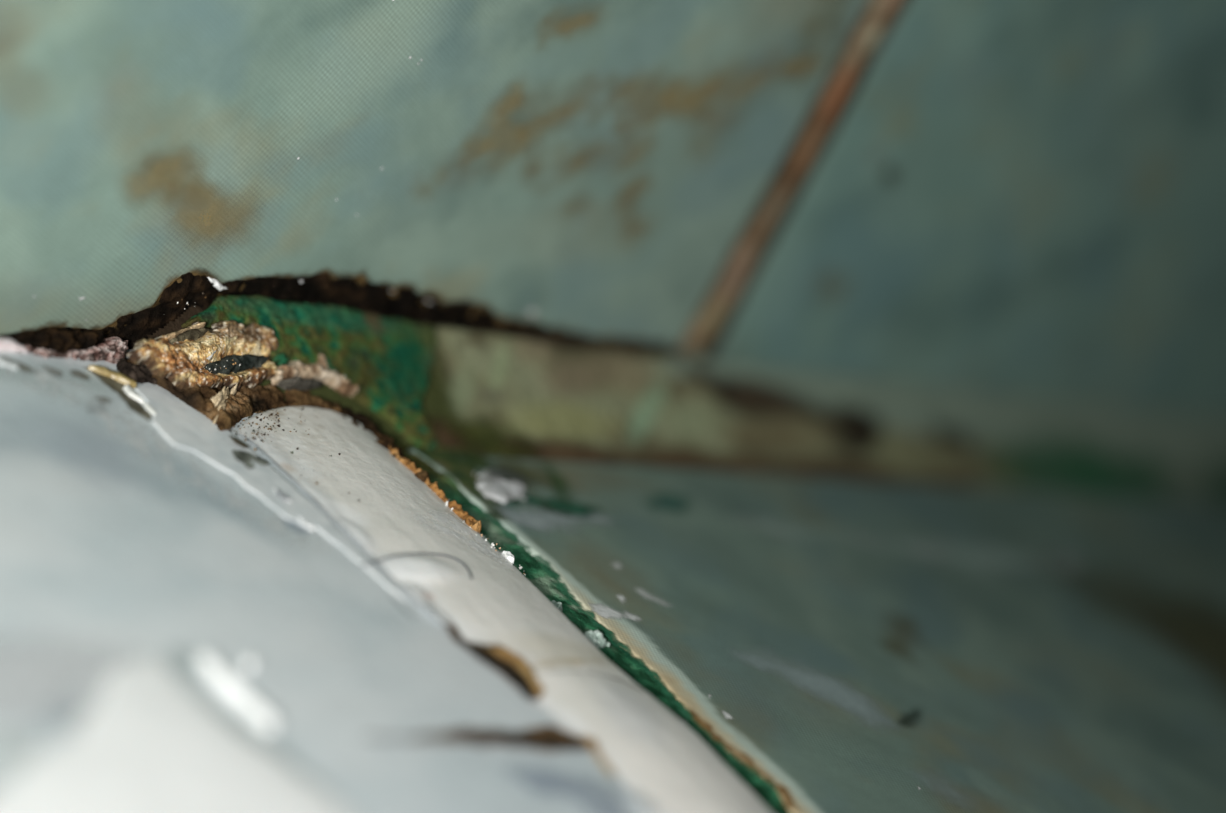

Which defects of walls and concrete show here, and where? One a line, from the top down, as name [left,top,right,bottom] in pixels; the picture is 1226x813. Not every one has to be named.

crack [229,428,343,526]
spalling [2,272,667,603]
crack [367,555,614,775]